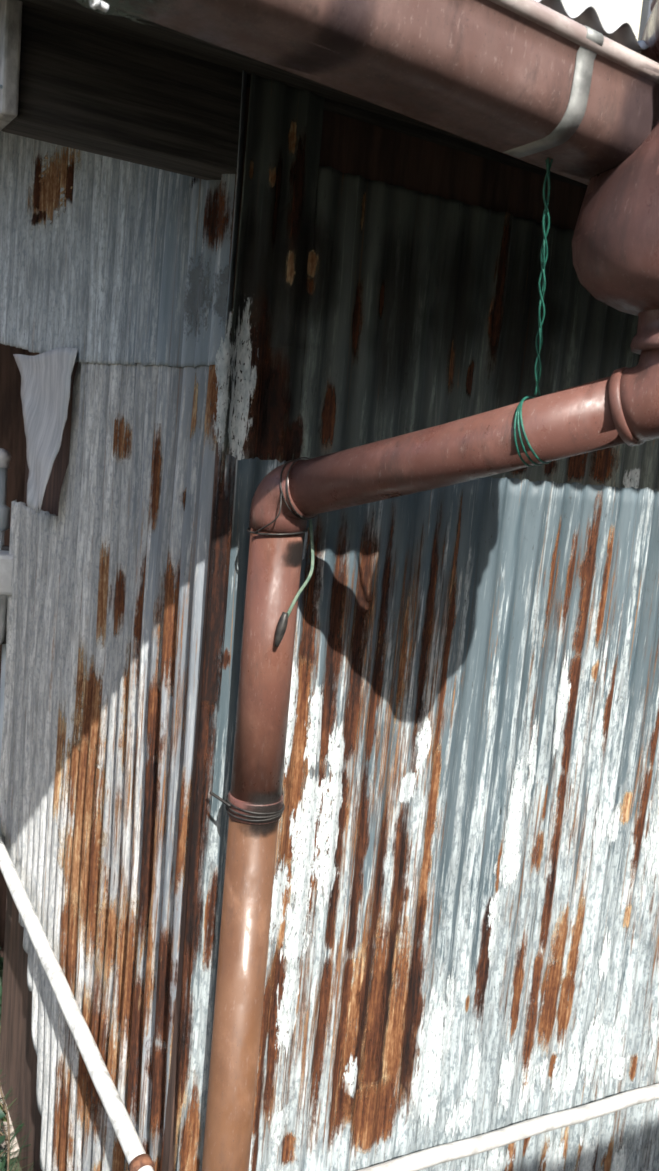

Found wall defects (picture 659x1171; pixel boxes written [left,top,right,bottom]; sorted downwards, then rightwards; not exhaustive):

corrosion [27,147,81,230]
corrosion [203,182,234,249]
peeling [184,249,259,461]
corrosion [286,250,318,294]
corrosion [52,301,303,1171]
corrosion [251,493,463,1171]
corrosion [465,448,620,1089]
corrosion [617,648,659,1015]
corrosion [618,1038,659,1094]